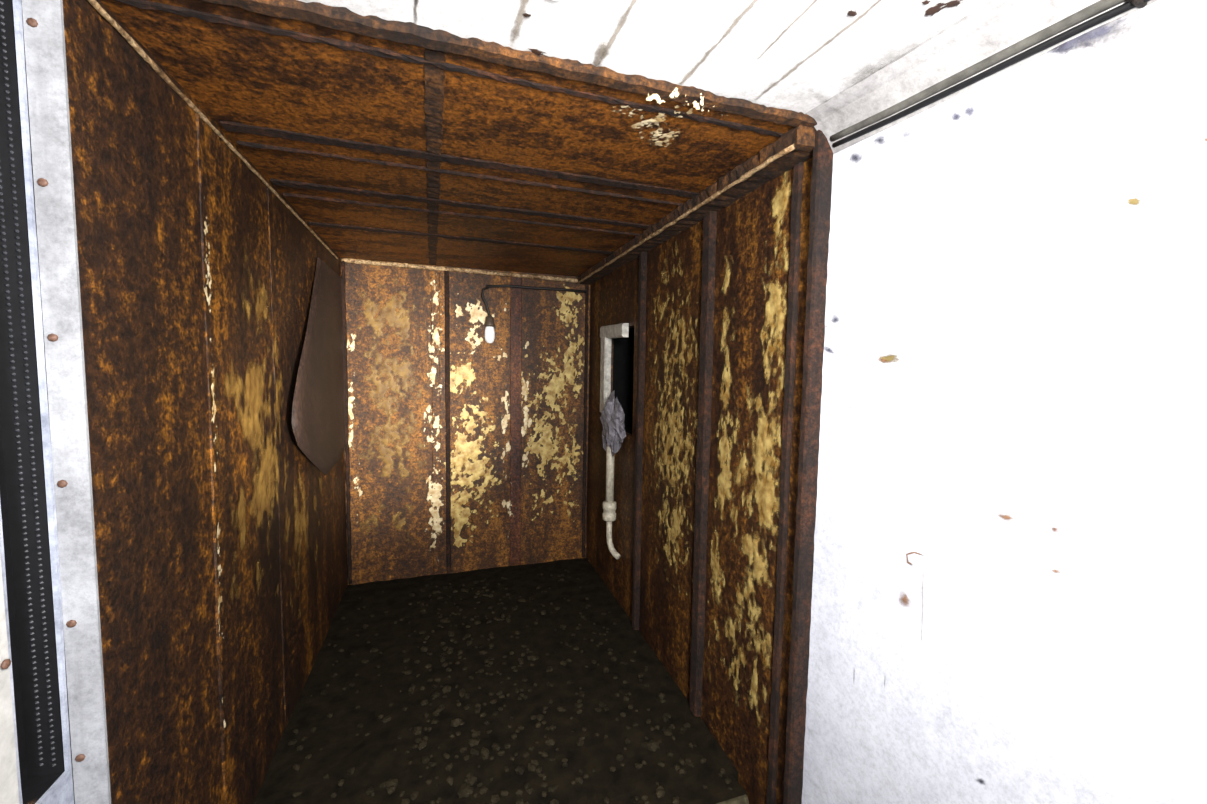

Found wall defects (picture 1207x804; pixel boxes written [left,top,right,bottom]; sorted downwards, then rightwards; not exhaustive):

peeling [613,87,714,147]
peeling [347,278,589,548]
peeling [649,248,698,580]
peeling [708,172,791,725]